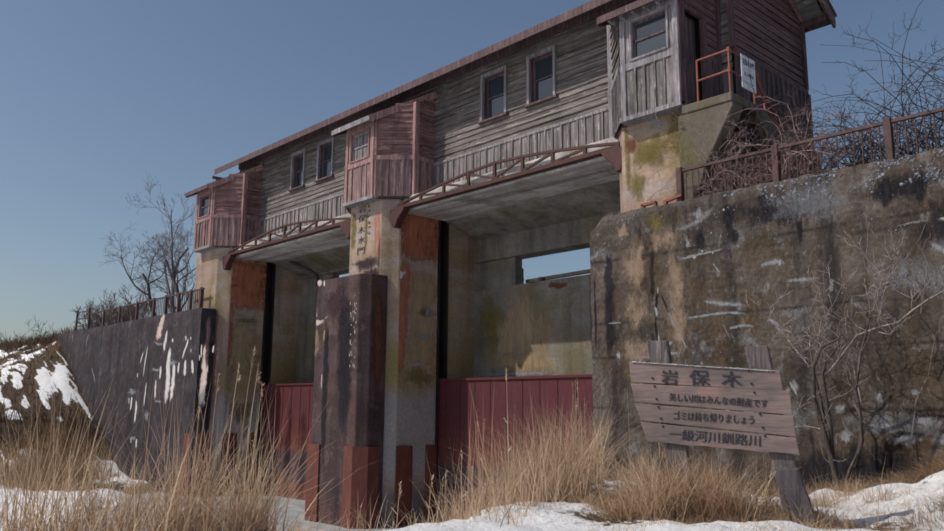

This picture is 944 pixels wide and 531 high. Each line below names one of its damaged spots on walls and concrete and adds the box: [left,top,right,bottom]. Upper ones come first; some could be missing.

damp [625,112,682,198]
damp [723,189,826,243]
damp [869,173,944,253]
corrosion [227,260,266,404]
corrosion [398,214,439,392]